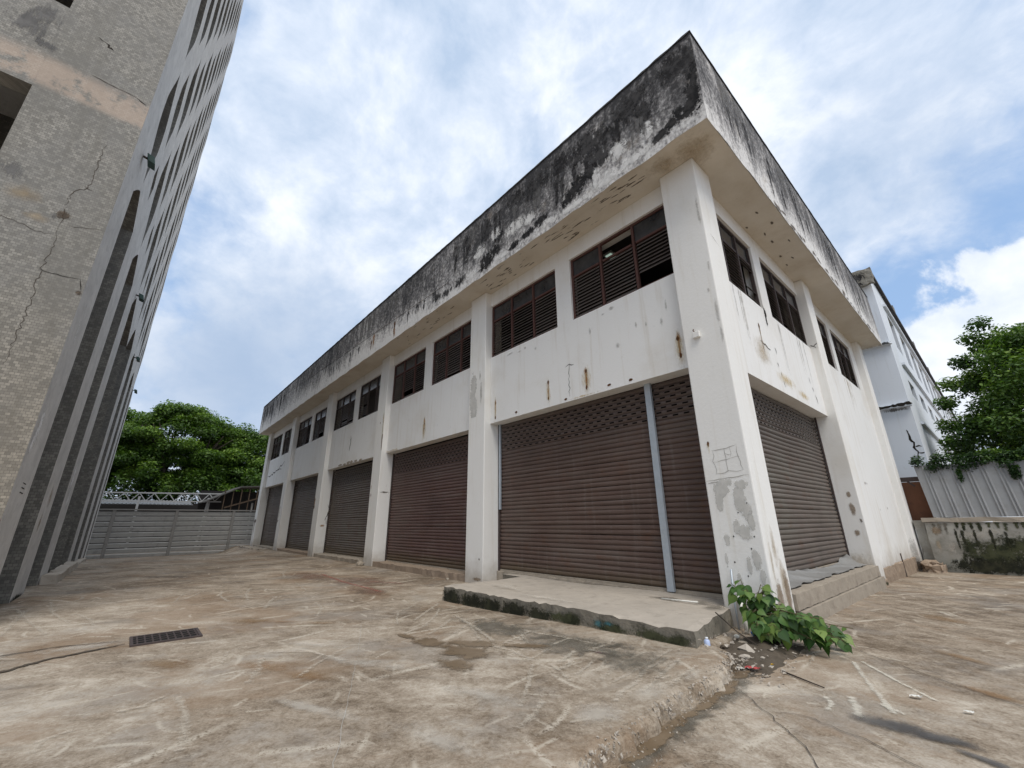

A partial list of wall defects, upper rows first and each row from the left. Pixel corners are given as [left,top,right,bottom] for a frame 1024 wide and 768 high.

damp [13,6,62,50]
damp [407,45,703,320]
crack [1,144,108,362]
damp [329,310,376,377]
crack [906,430,925,456]
peeling [713,479,767,585]
damp [932,522,1024,576]